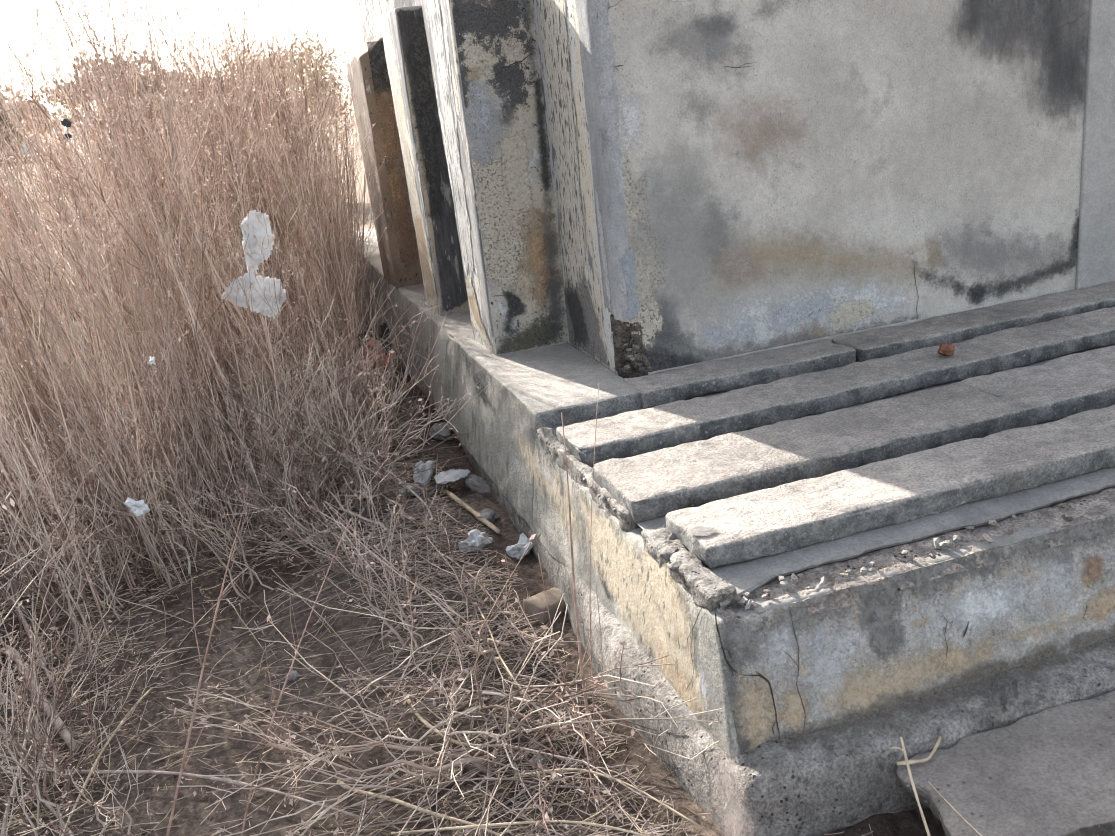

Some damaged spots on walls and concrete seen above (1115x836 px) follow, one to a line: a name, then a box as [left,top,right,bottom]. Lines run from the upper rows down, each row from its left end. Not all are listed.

leakage [451,0,550,191]
leakage [958,0,1088,113]
peeling [610,91,668,374]
leakage [926,218,1079,304]
crack [686,605,822,738]